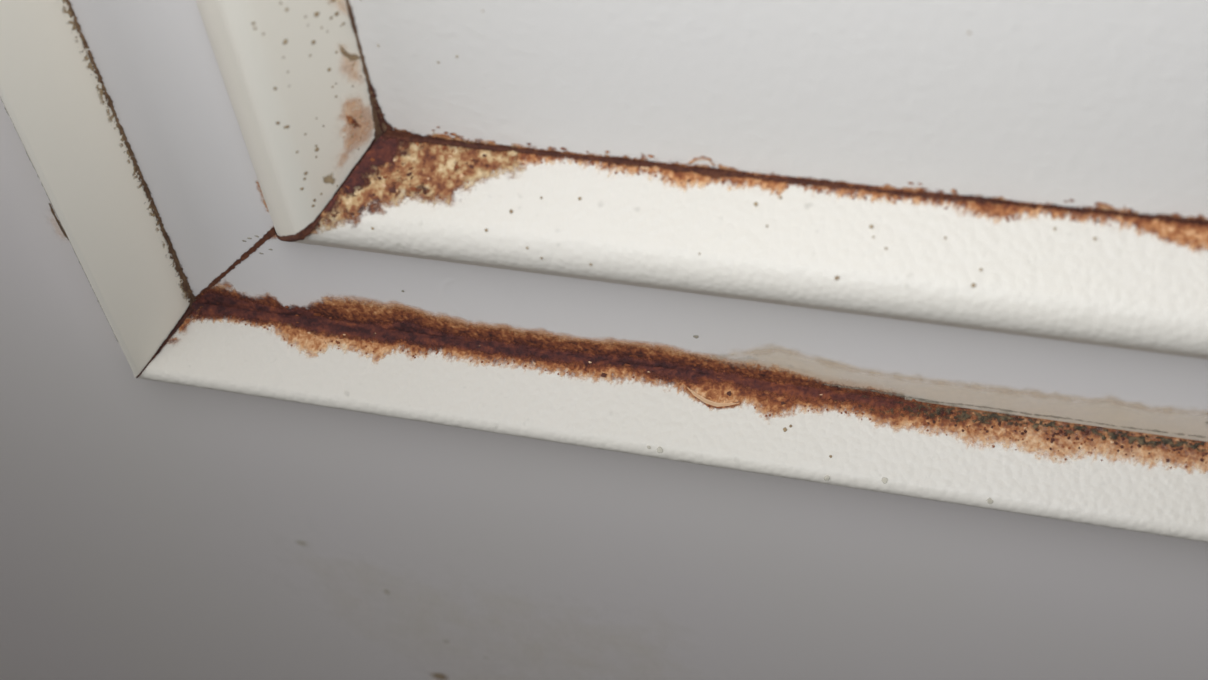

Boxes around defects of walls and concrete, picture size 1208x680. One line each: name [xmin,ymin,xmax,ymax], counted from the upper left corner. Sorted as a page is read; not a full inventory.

corrosion [310,47,1208,251]
corrosion [188,286,1208,473]